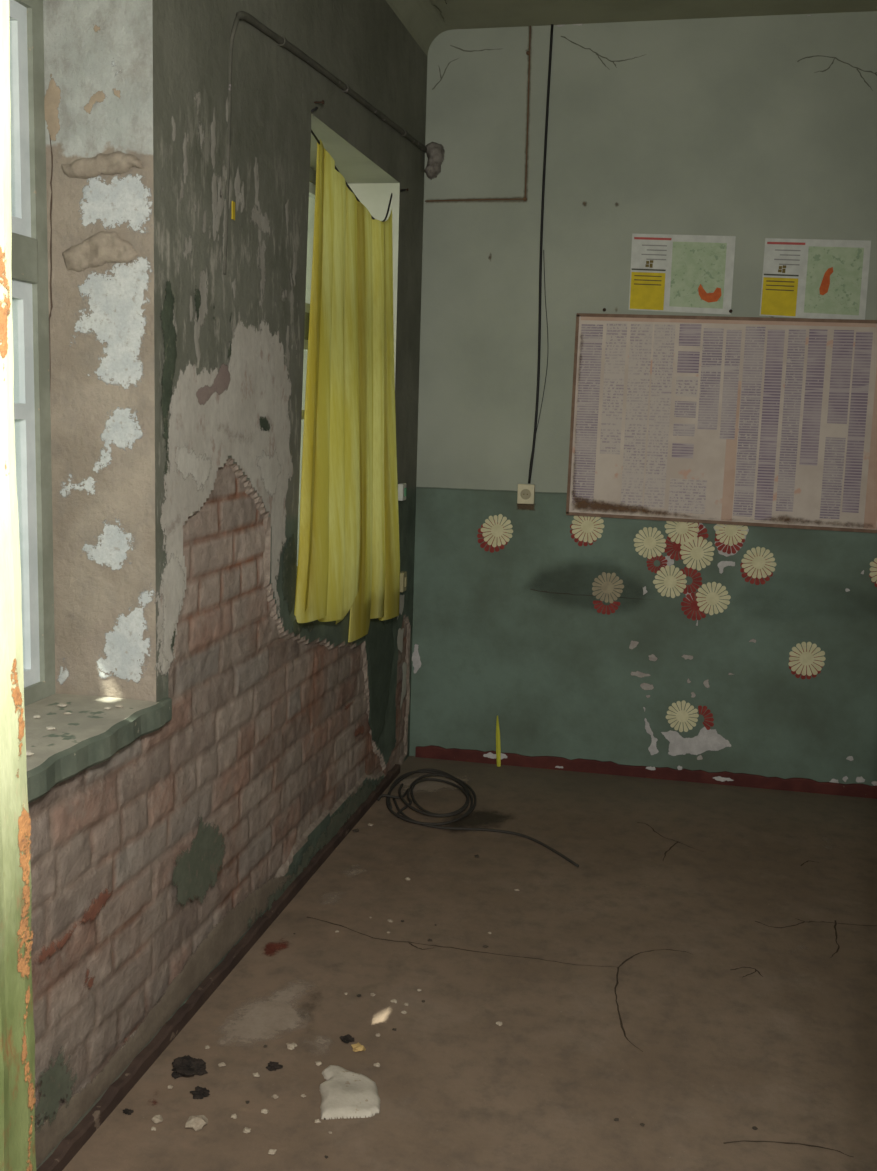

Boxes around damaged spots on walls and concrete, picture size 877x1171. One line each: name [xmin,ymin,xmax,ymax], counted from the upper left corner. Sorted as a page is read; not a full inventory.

spalling [44,74,61,141]
crack [561,36,643,70]
crack [797,55,877,91]
peeling [0,247,11,381]
flaking render [17,92,421,1171]
peeling [10,658,25,778]
spalling [631,654,731,770]
crack [307,917,691,1052]